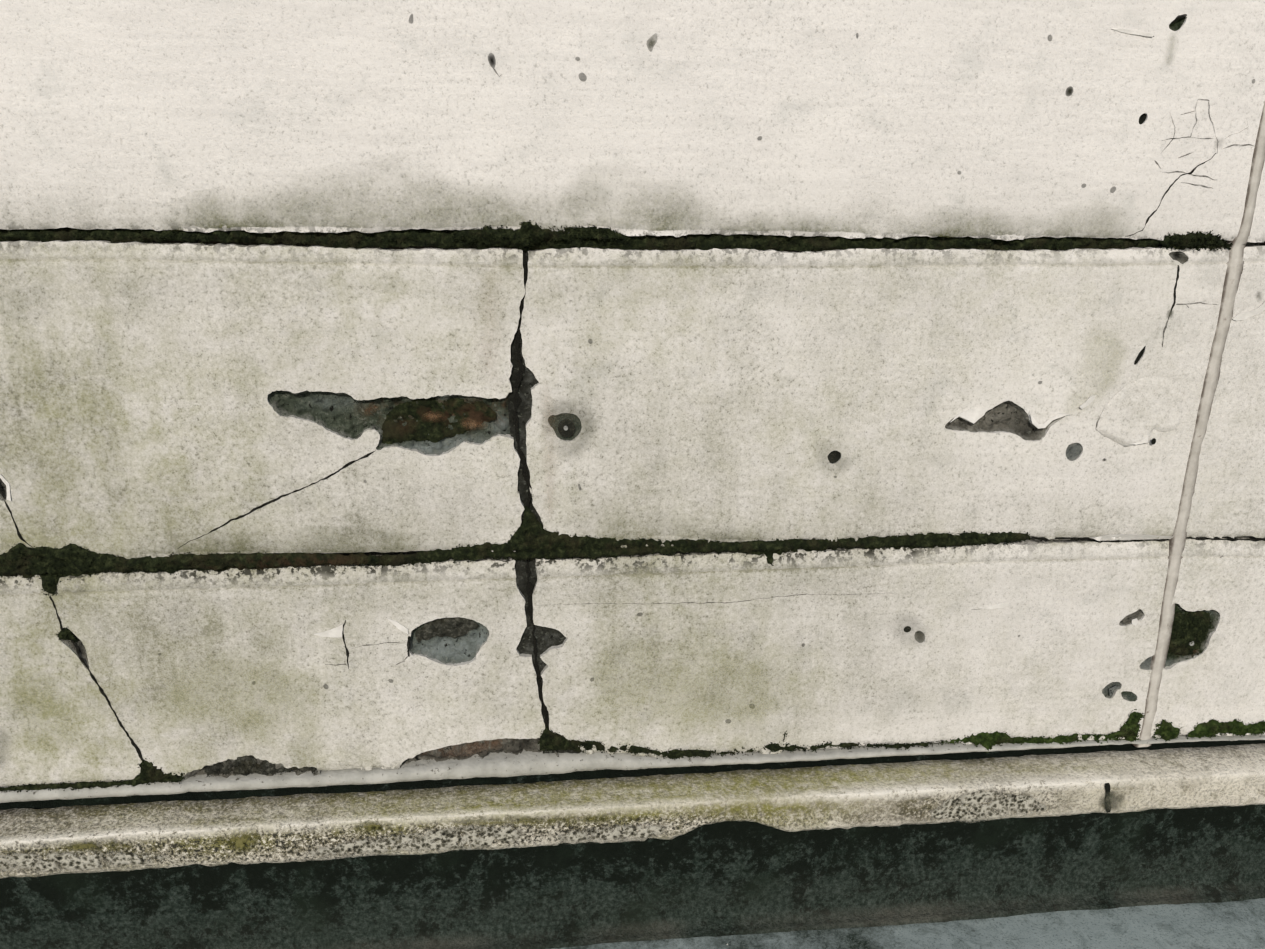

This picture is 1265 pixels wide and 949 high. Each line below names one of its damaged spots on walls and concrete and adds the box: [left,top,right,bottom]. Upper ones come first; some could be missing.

crack [1125,99,1253,237]
crack [1162,265,1217,347]
spalling [268,390,522,455]
crack [508,251,543,528]
spalling [945,395,1096,440]
crack [4,501,33,548]
crack [177,451,375,549]
crack [49,596,145,761]
spalling [407,617,489,664]
crack [515,558,582,754]
spalling [1139,603,1220,670]